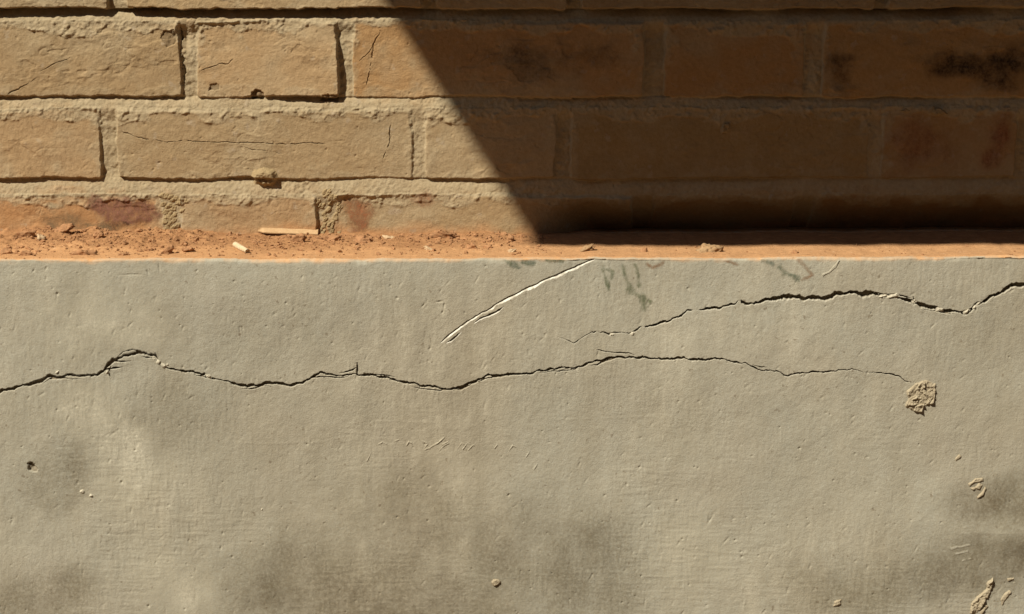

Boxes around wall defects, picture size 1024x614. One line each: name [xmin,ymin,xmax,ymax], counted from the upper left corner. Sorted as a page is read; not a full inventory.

crack [0,278,1024,397]
crack [440,259,596,346]
spalling [905,380,936,412]
peeling [970,577,1014,614]